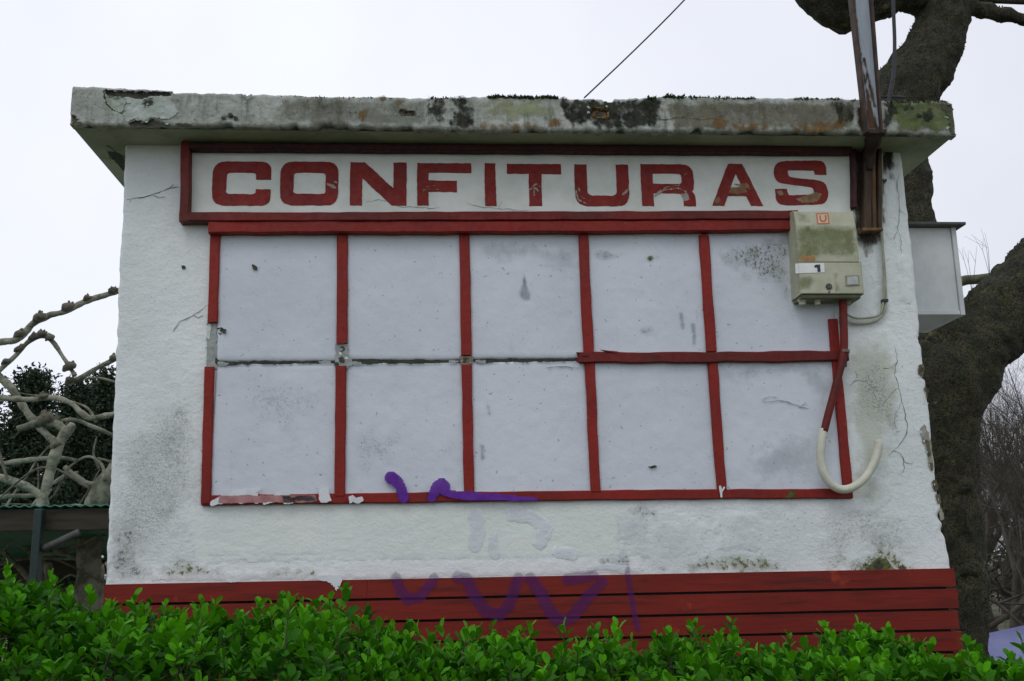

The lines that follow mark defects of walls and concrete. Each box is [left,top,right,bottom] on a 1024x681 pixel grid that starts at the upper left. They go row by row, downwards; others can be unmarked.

peeling [104,89,193,128]
mould [427,96,474,127]
mould [560,97,663,130]
mould [883,102,933,127]
mould [726,244,787,291]
crack [851,349,912,473]
flaking render [920,424,944,520]